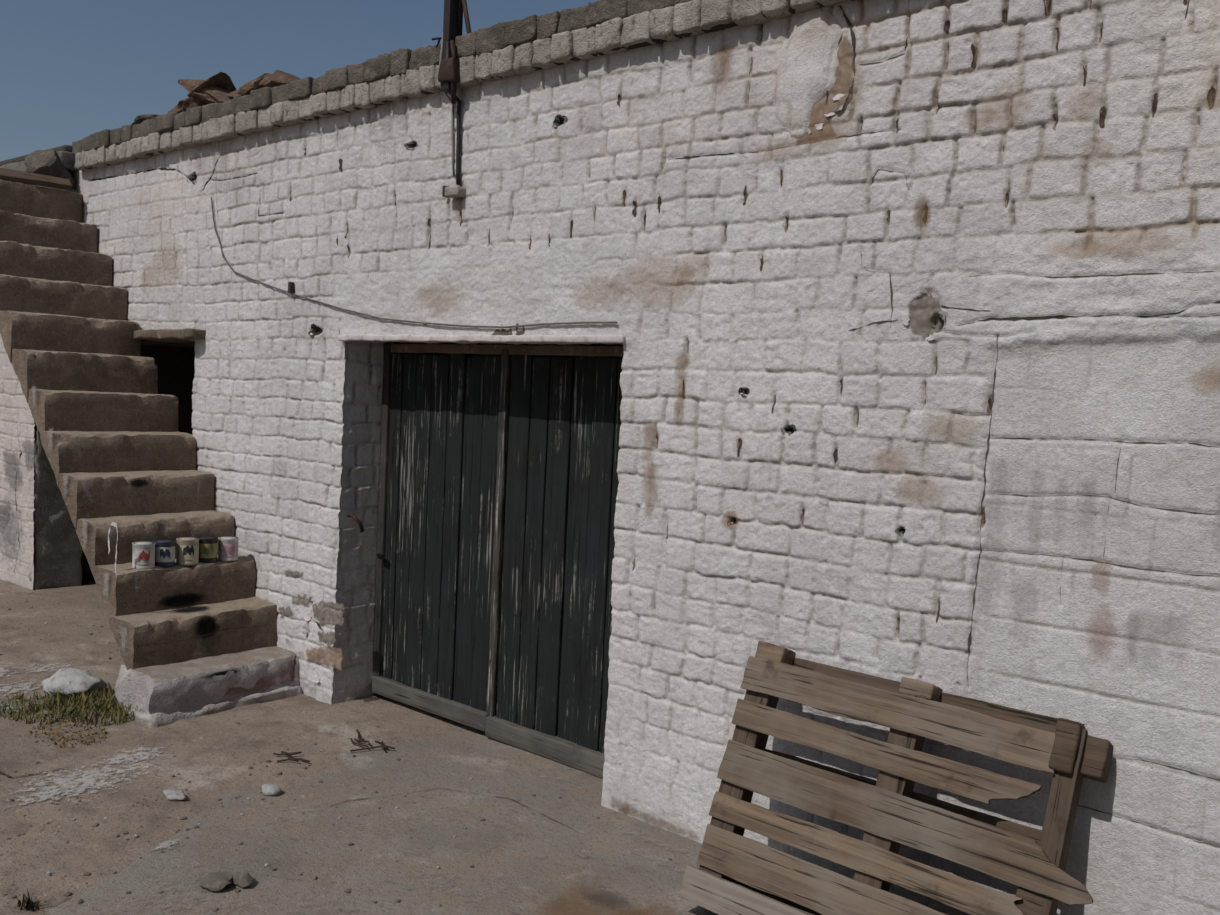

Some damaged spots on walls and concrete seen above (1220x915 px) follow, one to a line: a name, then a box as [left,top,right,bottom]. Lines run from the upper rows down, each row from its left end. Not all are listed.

spalling [849,286,990,341]
crack [969,270,1213,278]
crack [946,301,1220,680]
peeling [279,593,345,683]